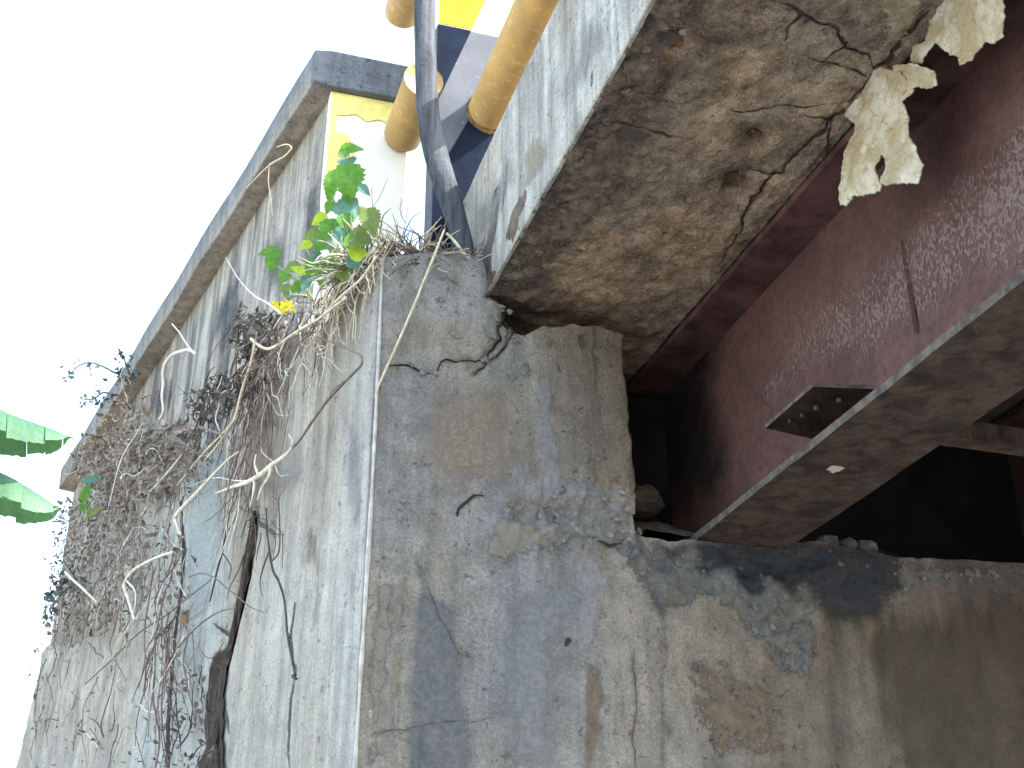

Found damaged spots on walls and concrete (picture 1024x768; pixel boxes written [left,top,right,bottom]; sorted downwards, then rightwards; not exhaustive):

crack [721,0,929,263]
crack [390,295,514,376]
crack [198,511,276,768]
water stain [663,540,1024,768]